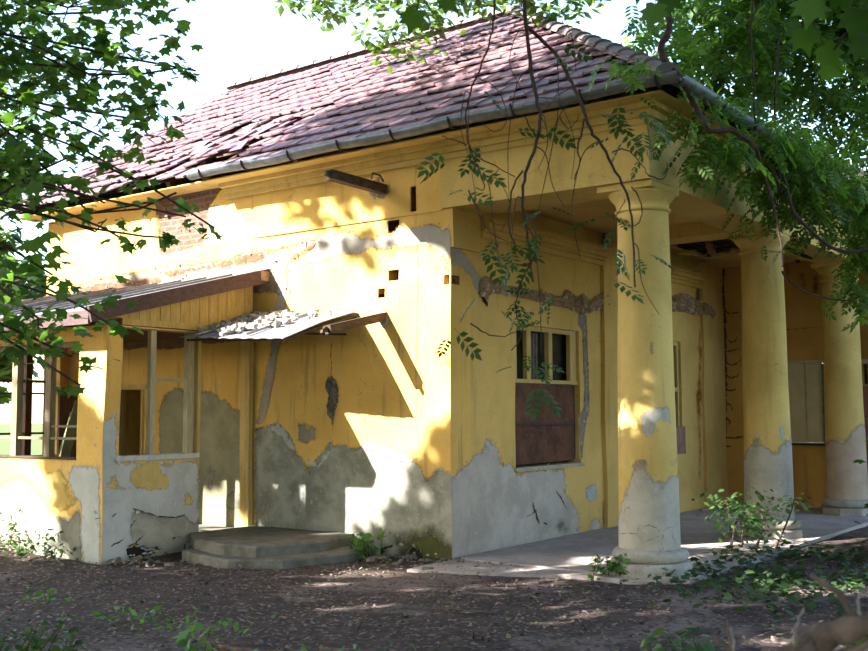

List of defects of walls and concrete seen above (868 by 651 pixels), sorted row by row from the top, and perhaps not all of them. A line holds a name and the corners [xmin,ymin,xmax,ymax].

flaking render [77,179,317,311]
spalling [385,219,402,236]
spalling [364,270,405,328]
peeling [92,411,200,565]
flaking render [253,340,602,560]
flaking render [618,460,681,551]
flaking render [744,426,795,520]
flaking render [825,424,868,500]